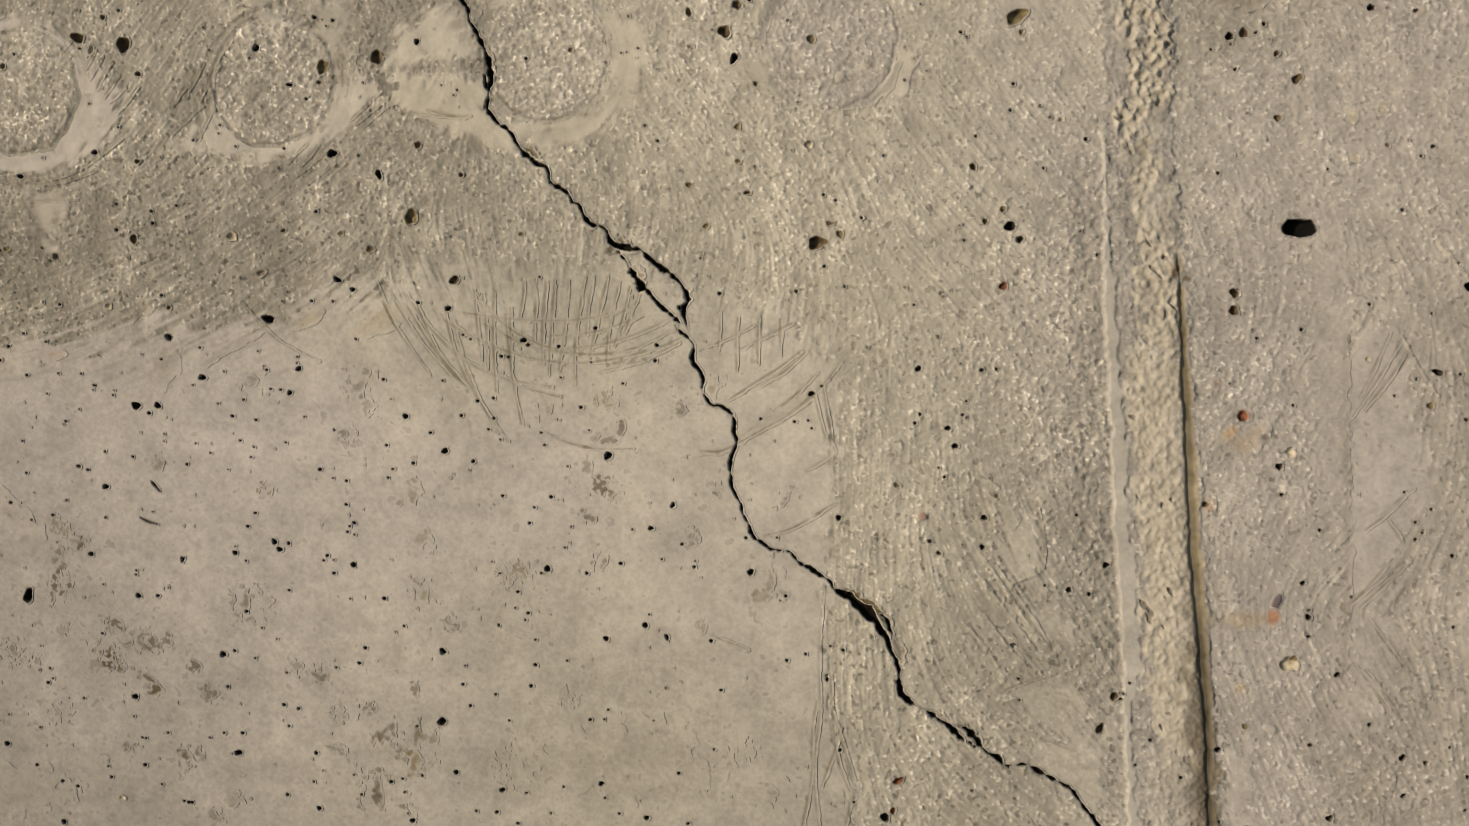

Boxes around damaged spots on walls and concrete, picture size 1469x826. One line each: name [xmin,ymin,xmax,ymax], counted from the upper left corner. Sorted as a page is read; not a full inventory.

crack [458,0,1103,826]